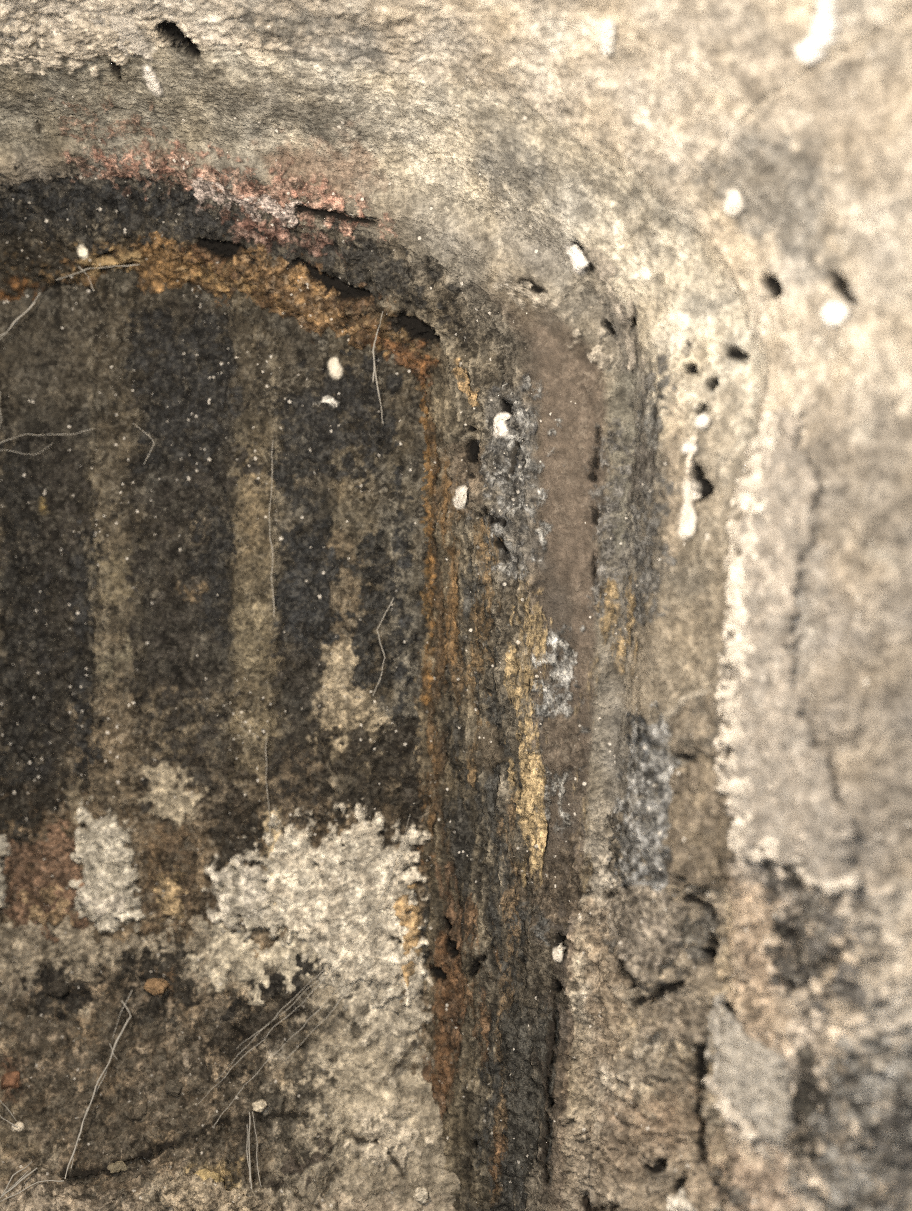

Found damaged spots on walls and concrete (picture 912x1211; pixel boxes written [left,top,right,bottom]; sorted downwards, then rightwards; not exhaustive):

peeling [160,1171,276,1211]
leakage [0,161,474,352]
leakage [0,281,583,1211]
corrosion [59,231,548,1205]